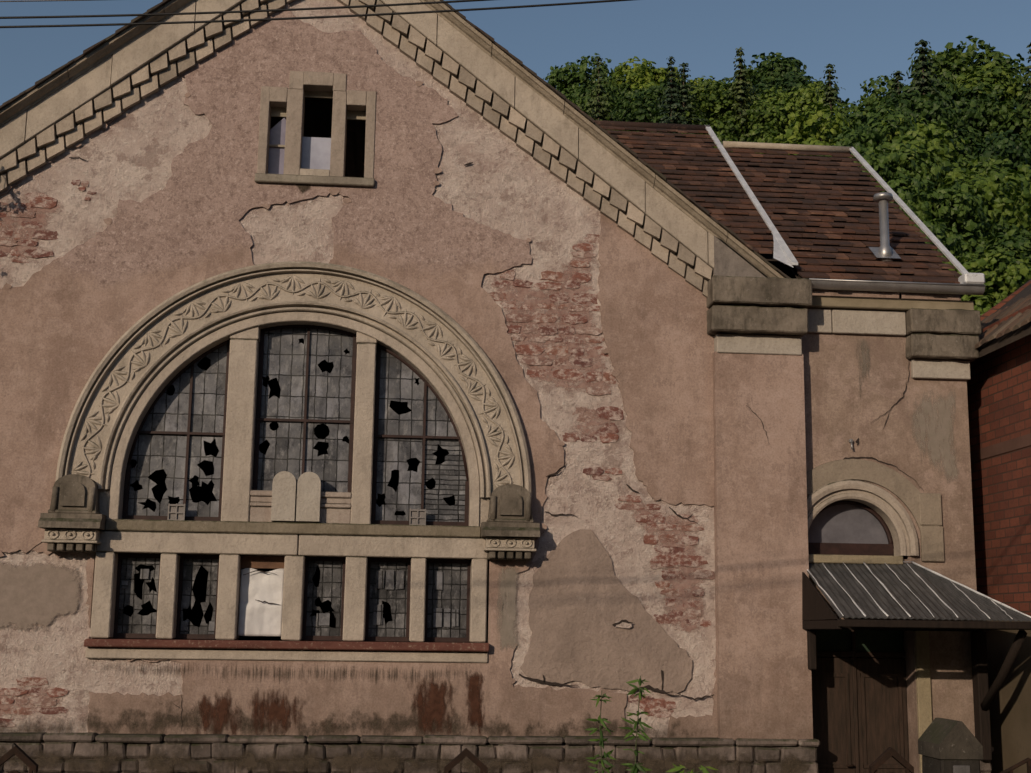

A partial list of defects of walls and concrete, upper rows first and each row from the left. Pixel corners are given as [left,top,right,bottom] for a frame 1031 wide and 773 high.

peeling [0,73,212,289]
peeling [239,187,352,265]
peeling [289,0,716,738]
crack [844,366,924,491]
peeling [0,550,183,733]
water stain [0,708,288,734]
water stain [300,669,512,736]